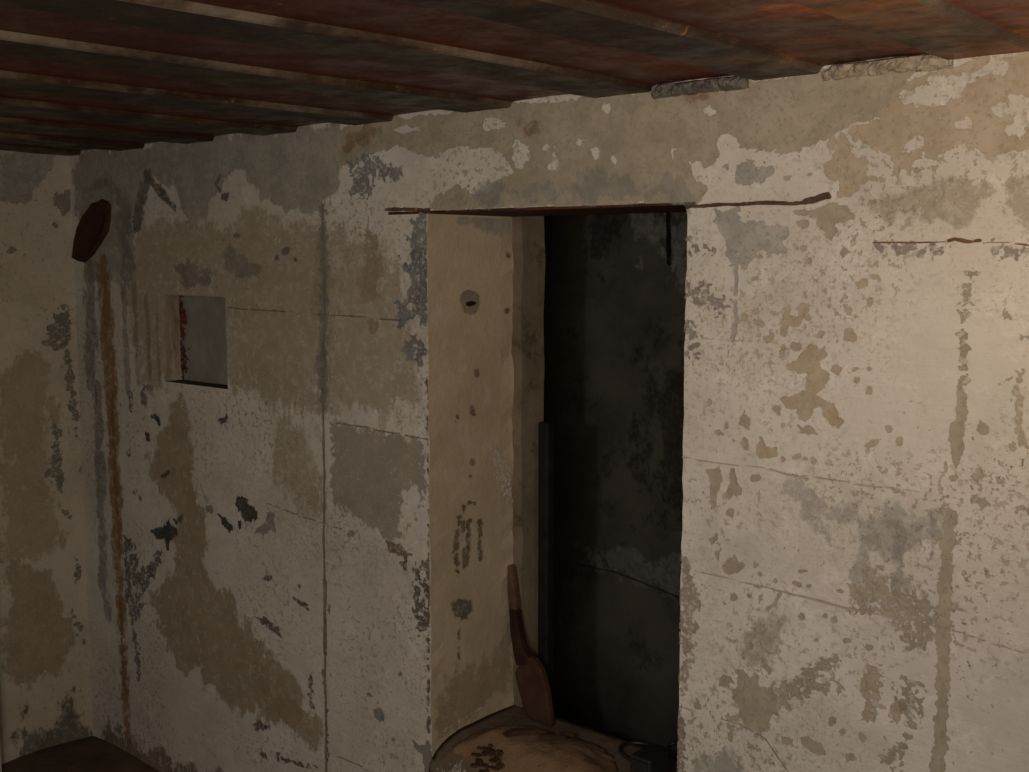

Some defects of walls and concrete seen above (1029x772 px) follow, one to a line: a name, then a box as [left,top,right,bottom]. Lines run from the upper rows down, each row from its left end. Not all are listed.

crack [666,192,831,266]
leakage [72,123,419,418]
peeling [42,304,80,438]
corrosion [179,295,190,380]
peeling [316,51,1029,772]
peeling [44,424,65,493]
corrosion [96,254,130,744]
spalling [150,514,183,551]
spalling [206,496,276,537]
peeling [254,616,281,637]
spalling [260,751,318,771]